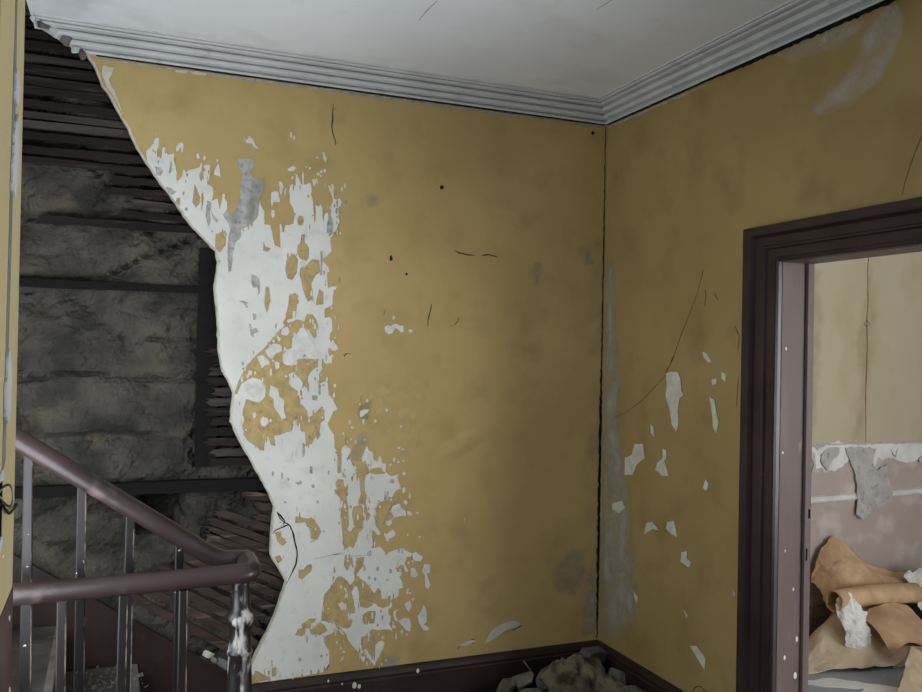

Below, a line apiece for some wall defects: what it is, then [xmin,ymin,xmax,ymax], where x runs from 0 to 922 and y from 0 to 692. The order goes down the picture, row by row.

crack [96,0,896,638]
peeling [30,15,430,684]
peeling [666,372,684,431]
peeling [709,397,719,433]
peeling [625,444,645,475]
peeling [655,449,669,476]
peeling [612,501,625,513]
peeling [644,521,677,537]
peeling [690,646,706,670]